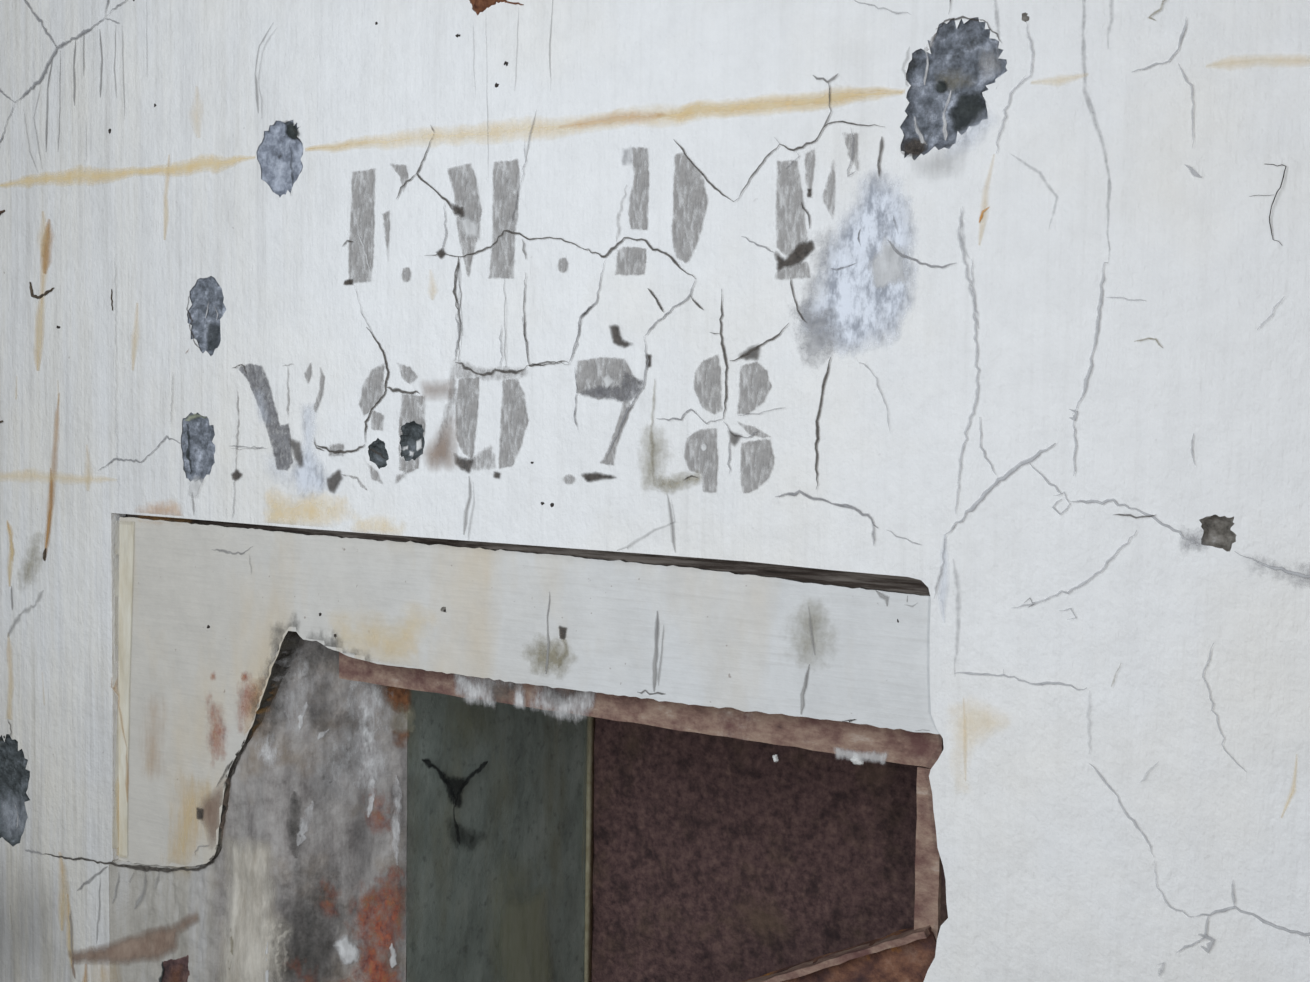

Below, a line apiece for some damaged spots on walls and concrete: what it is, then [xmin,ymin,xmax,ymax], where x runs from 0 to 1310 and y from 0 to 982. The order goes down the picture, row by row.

spalling [256,120,303,197]
crack [673,74,883,202]
spalling [900,16,1007,161]
crack [396,124,807,473]
crack [316,292,420,453]
crack [775,240,1195,619]
corrosion [386,686,410,718]
peeling [455,674,594,718]
spalling [0,721,30,846]
corrosion [69,916,197,982]
peeling [220,842,288,982]
corrosion [335,873,402,982]